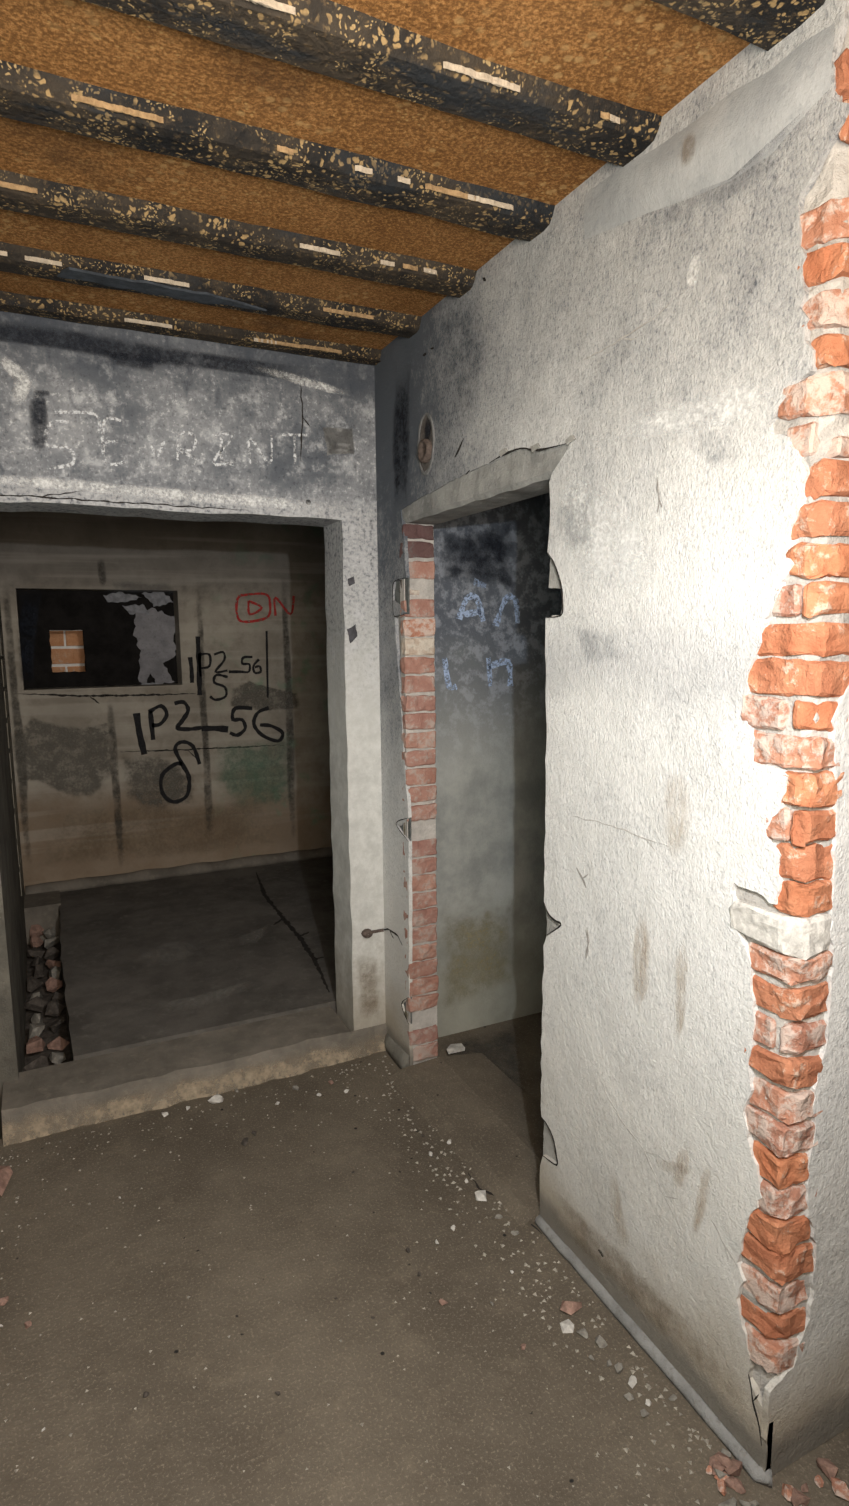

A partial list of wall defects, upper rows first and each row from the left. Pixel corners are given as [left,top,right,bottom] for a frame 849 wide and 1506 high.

peeling [103,592,176,685]
spalling [392,577,410,617]
spalling [728,27,849,1396]
spalling [396,818,412,841]
crack [256,872,330,992]